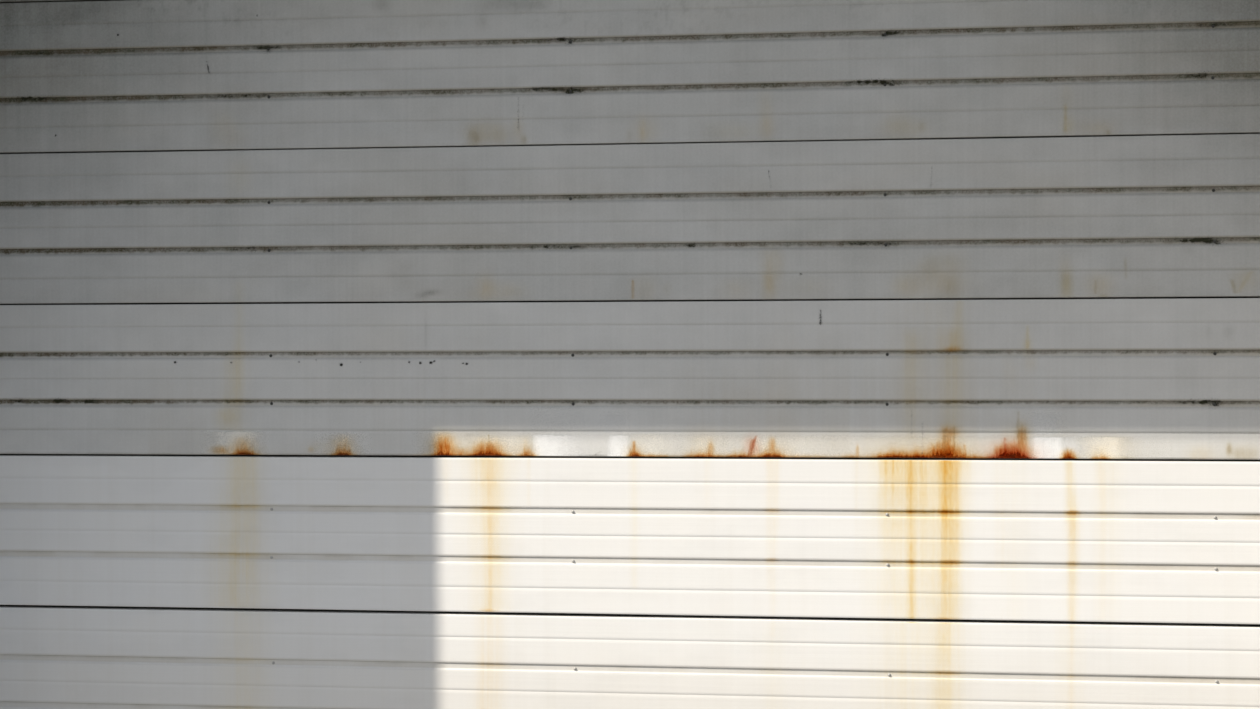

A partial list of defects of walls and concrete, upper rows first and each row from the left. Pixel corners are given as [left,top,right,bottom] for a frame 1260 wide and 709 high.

rust [993,451,1031,459]